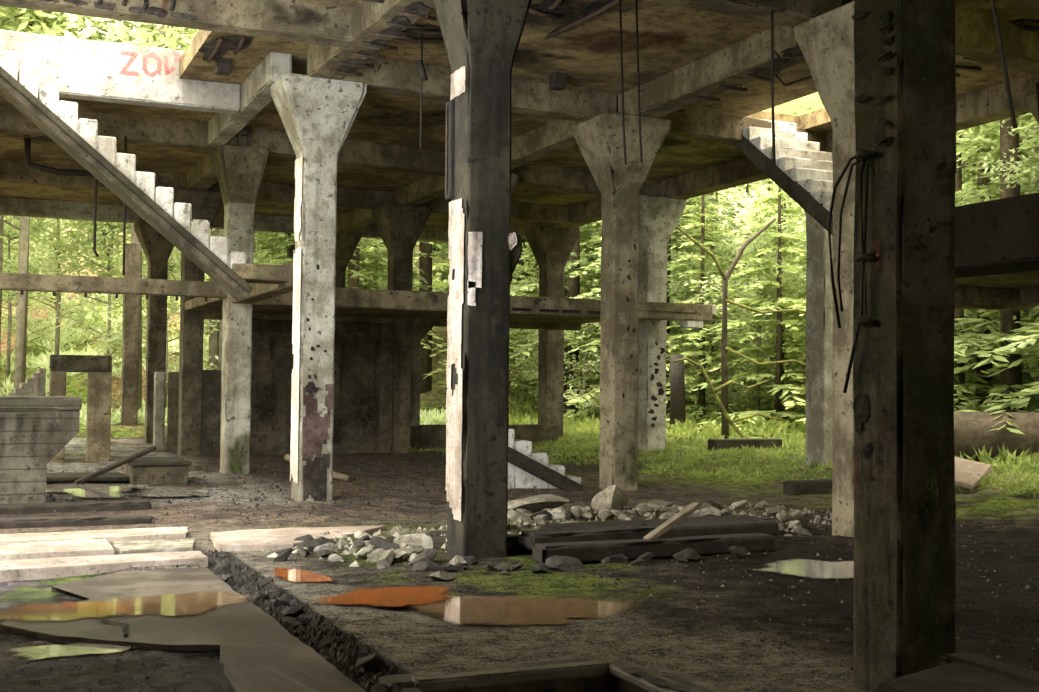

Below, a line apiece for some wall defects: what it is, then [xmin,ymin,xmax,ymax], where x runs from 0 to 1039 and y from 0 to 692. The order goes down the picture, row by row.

peeling [290,156,334,501]
crack [98,615,236,692]